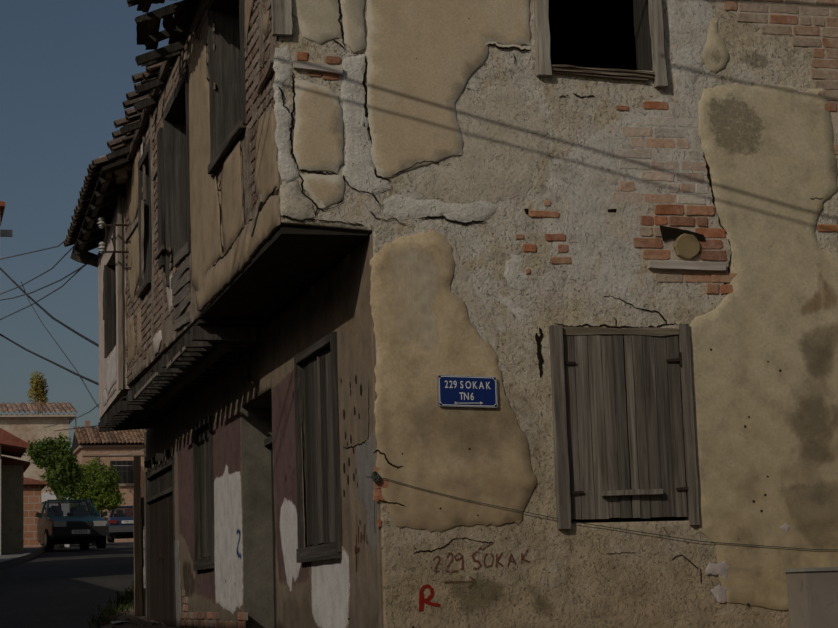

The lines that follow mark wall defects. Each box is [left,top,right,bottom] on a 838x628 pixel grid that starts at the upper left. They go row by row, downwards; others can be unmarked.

flaking render [244,0,275,217]
crack [333,0,372,144]
crack [485,42,530,61]
flaking render [715,0,838,159]
crack [212,72,486,267]
spalling [524,200,560,218]
spalling [545,233,571,264]
flaking render [608,101,737,294]
spalling [817,224,838,232]
crack [535,295,678,378]
flaking render [180,590,248,628]